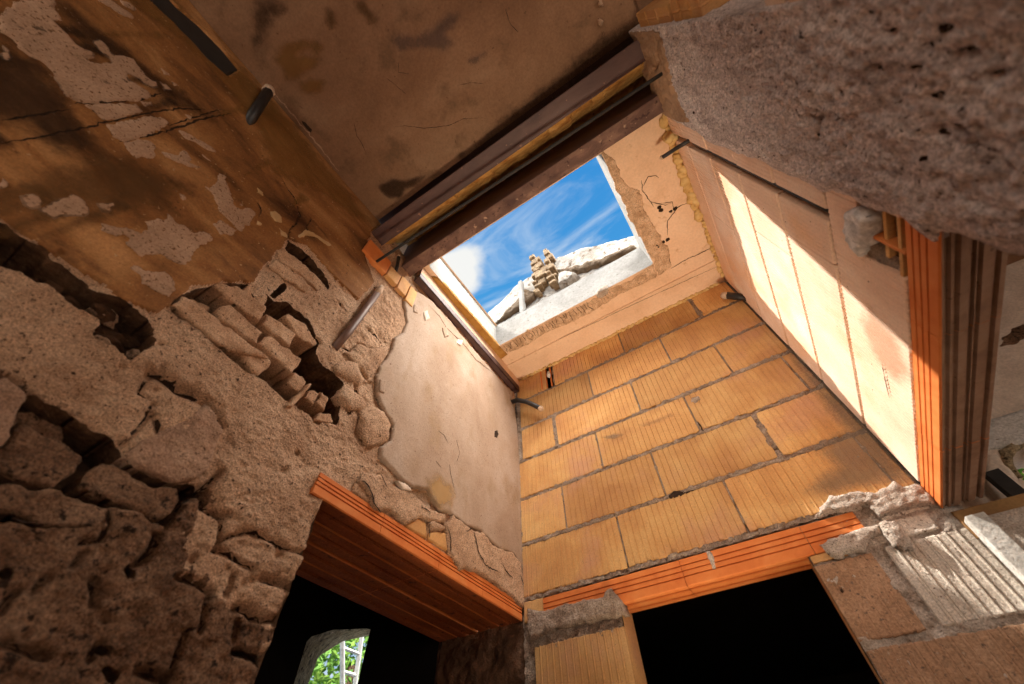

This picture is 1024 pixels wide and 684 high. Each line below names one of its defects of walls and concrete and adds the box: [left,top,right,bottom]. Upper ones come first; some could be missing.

crack [4,116,49,143]
peeling [0,0,216,168]
crack [63,93,231,142]
spalling [19,173,333,425]
leakage [380,178,420,197]
spalling [501,152,678,352]
crack [551,175,709,343]
spalling [0,378,223,536]
peeling [374,292,523,567]